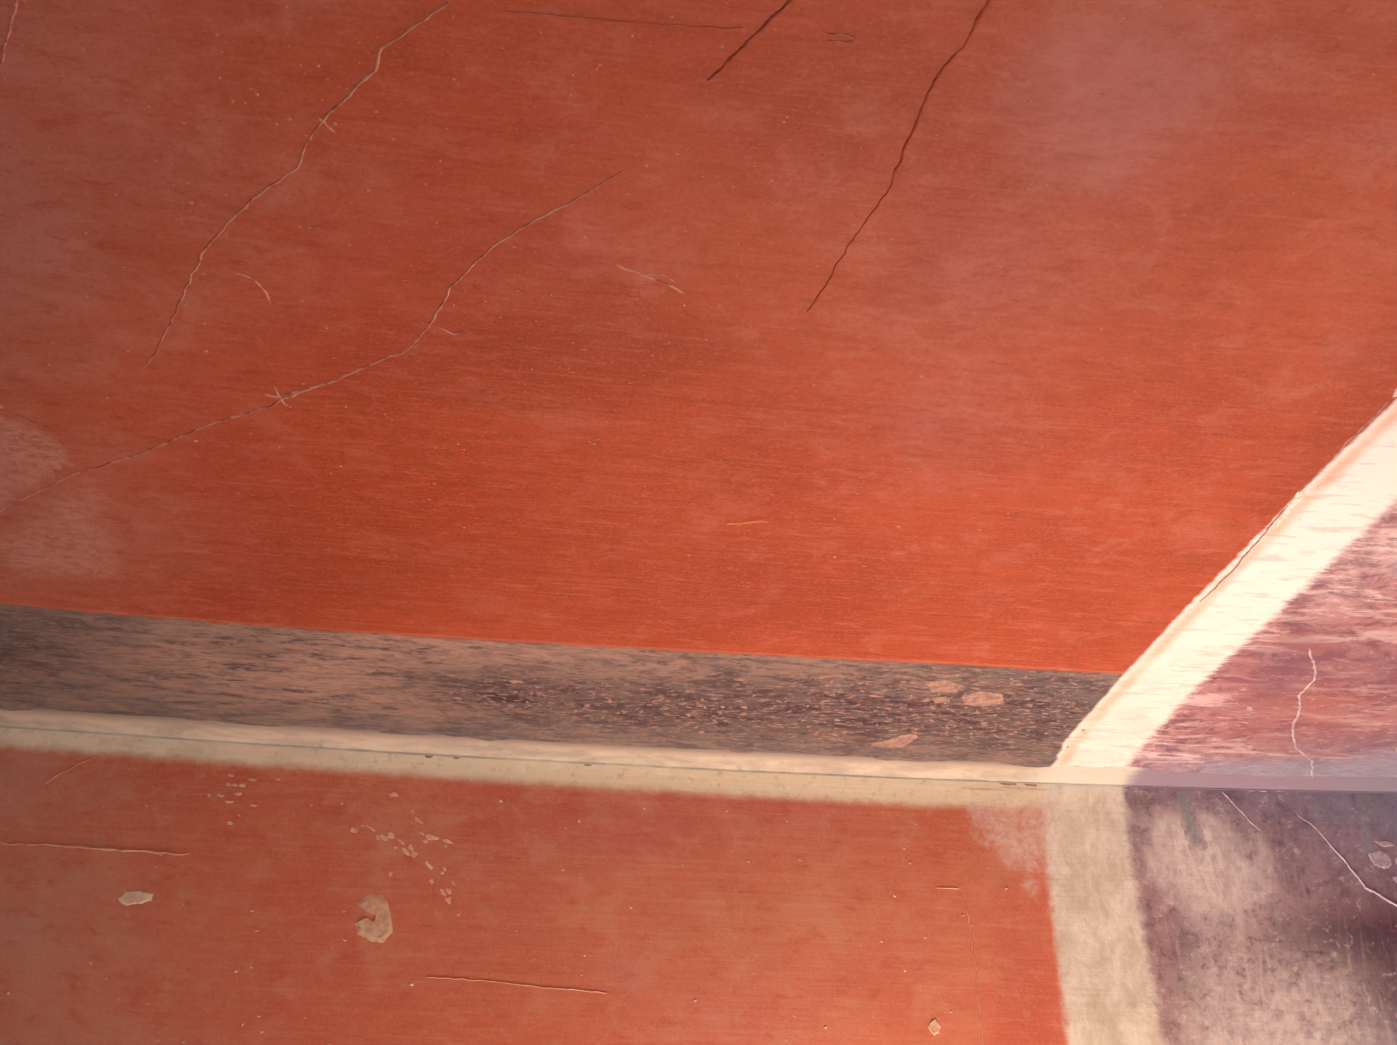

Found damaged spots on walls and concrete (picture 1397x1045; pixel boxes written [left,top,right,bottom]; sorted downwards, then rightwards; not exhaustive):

crack [0,0,19,68]
crack [708,0,793,81]
crack [145,0,451,367]
crack [807,0,991,312]
crack [0,170,623,512]
peeling [350,809,456,904]
peeling [354,894,393,943]